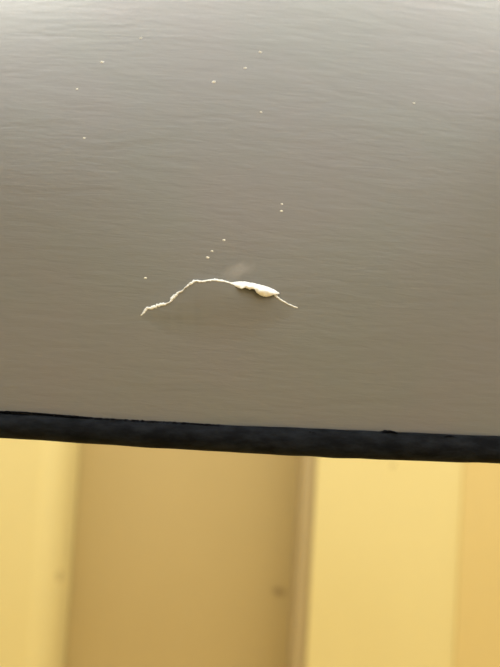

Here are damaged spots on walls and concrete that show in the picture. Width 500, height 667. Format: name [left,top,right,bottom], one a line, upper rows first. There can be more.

crack [141,278,298,315]